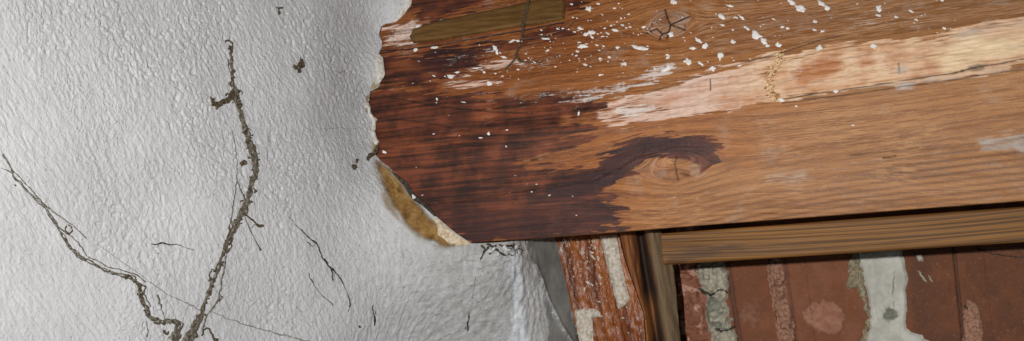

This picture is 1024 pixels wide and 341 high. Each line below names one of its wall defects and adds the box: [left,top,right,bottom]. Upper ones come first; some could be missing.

flaking render [391,0,412,22]
flaking render [376,54,385,84]
flaking render [367,104,386,153]
crack [2,39,310,341]
spalling [433,218,470,246]
crack [288,216,376,328]